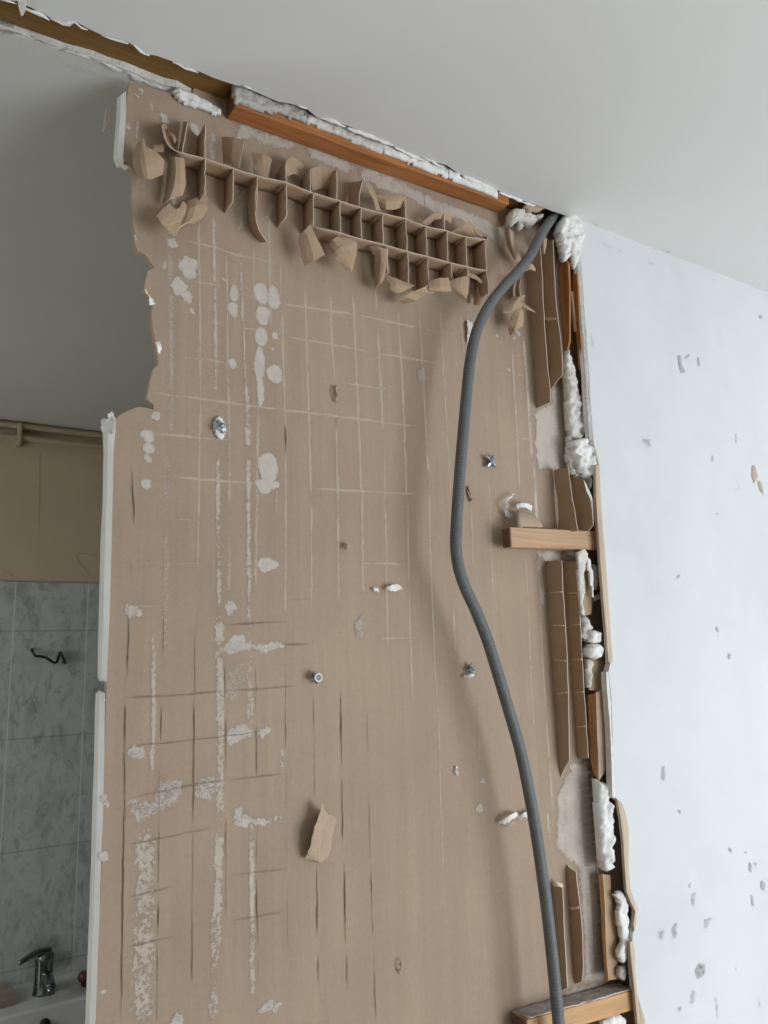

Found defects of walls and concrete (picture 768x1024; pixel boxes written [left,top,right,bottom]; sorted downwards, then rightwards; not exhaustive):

flaking render [231,84,536,206]